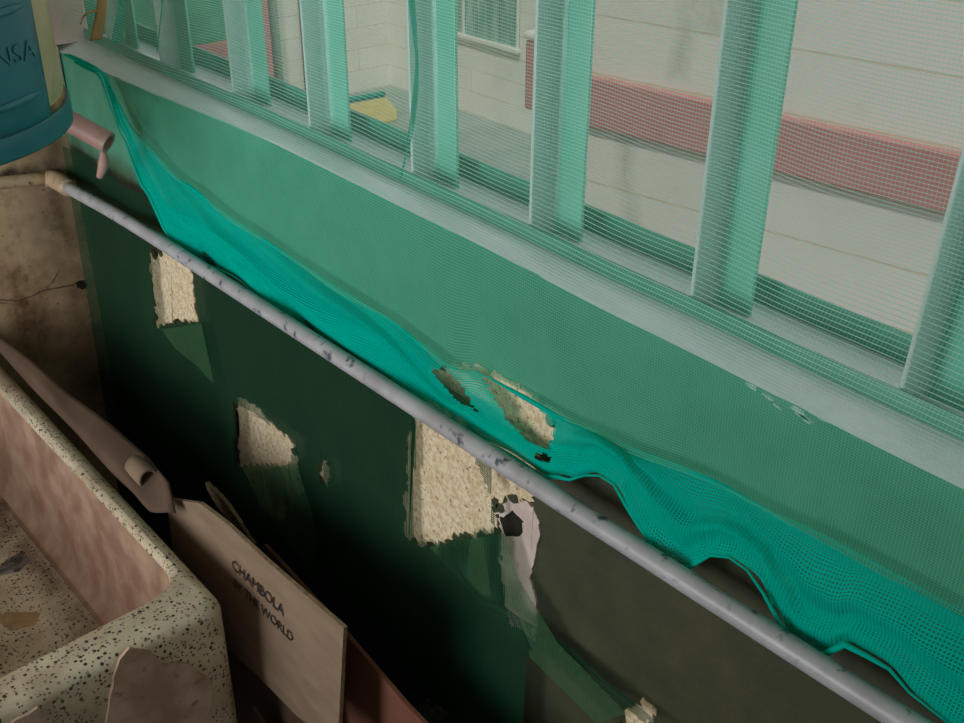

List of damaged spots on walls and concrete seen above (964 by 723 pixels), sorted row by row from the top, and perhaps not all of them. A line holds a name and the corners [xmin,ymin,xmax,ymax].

spalling [149,249,199,329]
spalling [236,397,304,521]
spalling [420,362,556,470]
spalling [403,416,542,641]